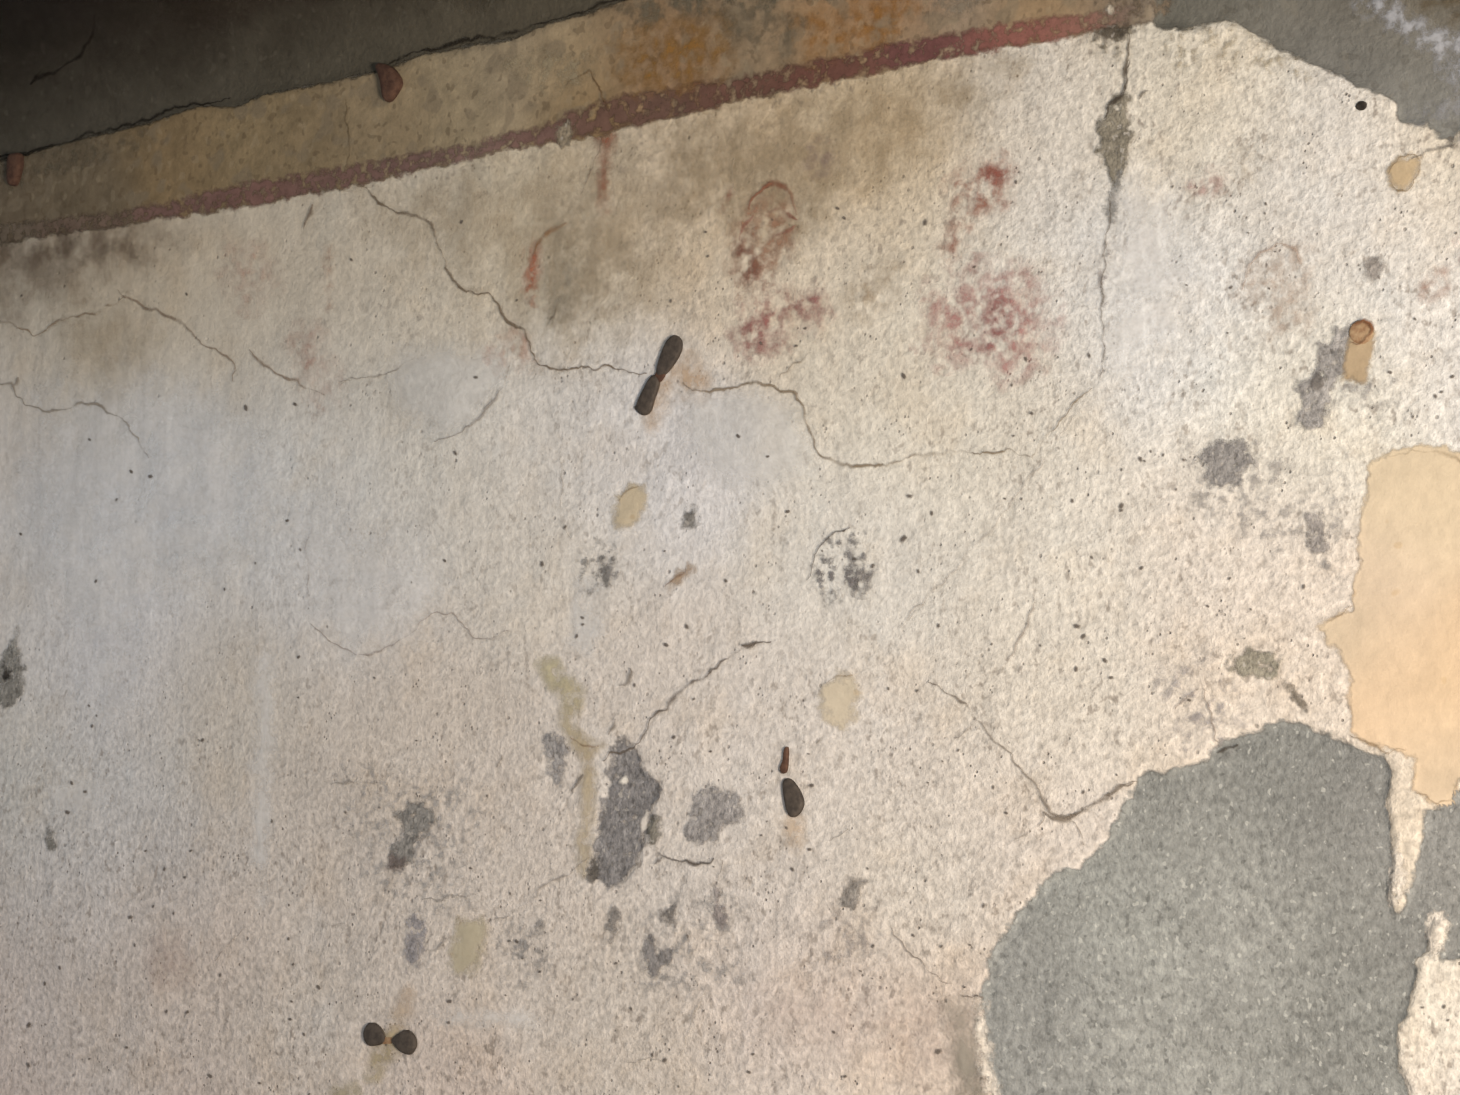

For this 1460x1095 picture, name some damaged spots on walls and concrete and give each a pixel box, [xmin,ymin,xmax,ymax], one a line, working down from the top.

spalling [1093,26,1134,223]
crack [1123,29,1148,99]
crack [17,295,301,386]
crack [370,193,647,442]
crack [973,204,1111,457]
crack [0,377,149,458]
crack [683,382,913,468]
spalling [587,736,663,889]
crack [571,641,770,791]
crack [928,682,1135,845]
spalling [605,907,621,941]